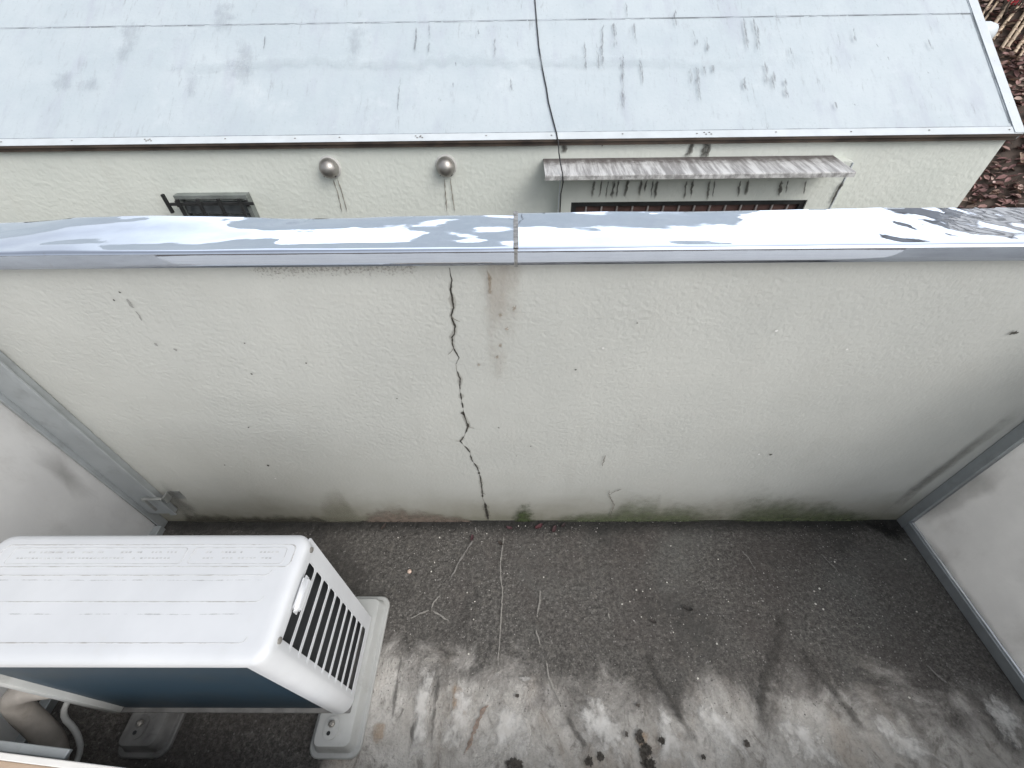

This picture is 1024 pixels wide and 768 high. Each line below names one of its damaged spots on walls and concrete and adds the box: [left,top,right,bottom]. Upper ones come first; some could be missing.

leakage [686,144,711,156]
leakage [592,181,658,196]
crack [411,268,504,676]
leakage [369,511,469,522]
crack [464,706,488,754]